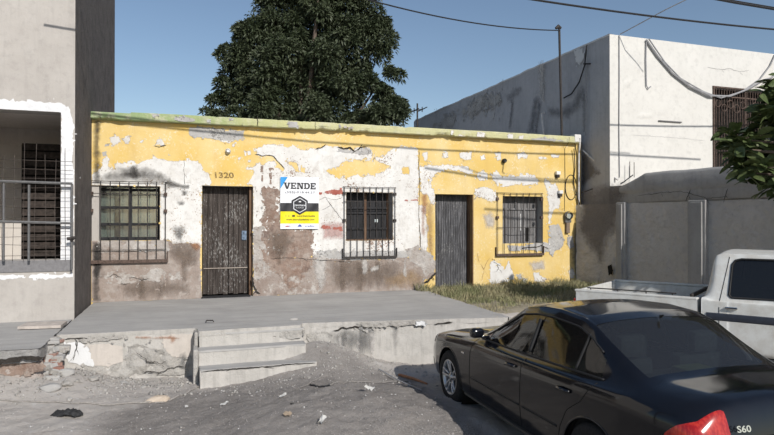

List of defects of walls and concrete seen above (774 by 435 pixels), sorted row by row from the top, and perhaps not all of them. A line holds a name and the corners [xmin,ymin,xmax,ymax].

peeling [91,132,212,302]
peeling [174,115,574,296]
efflorescence [314,255,325,288]
leakage [336,259,406,282]
spalling [357,320,427,333]
spalling [43,334,191,381]